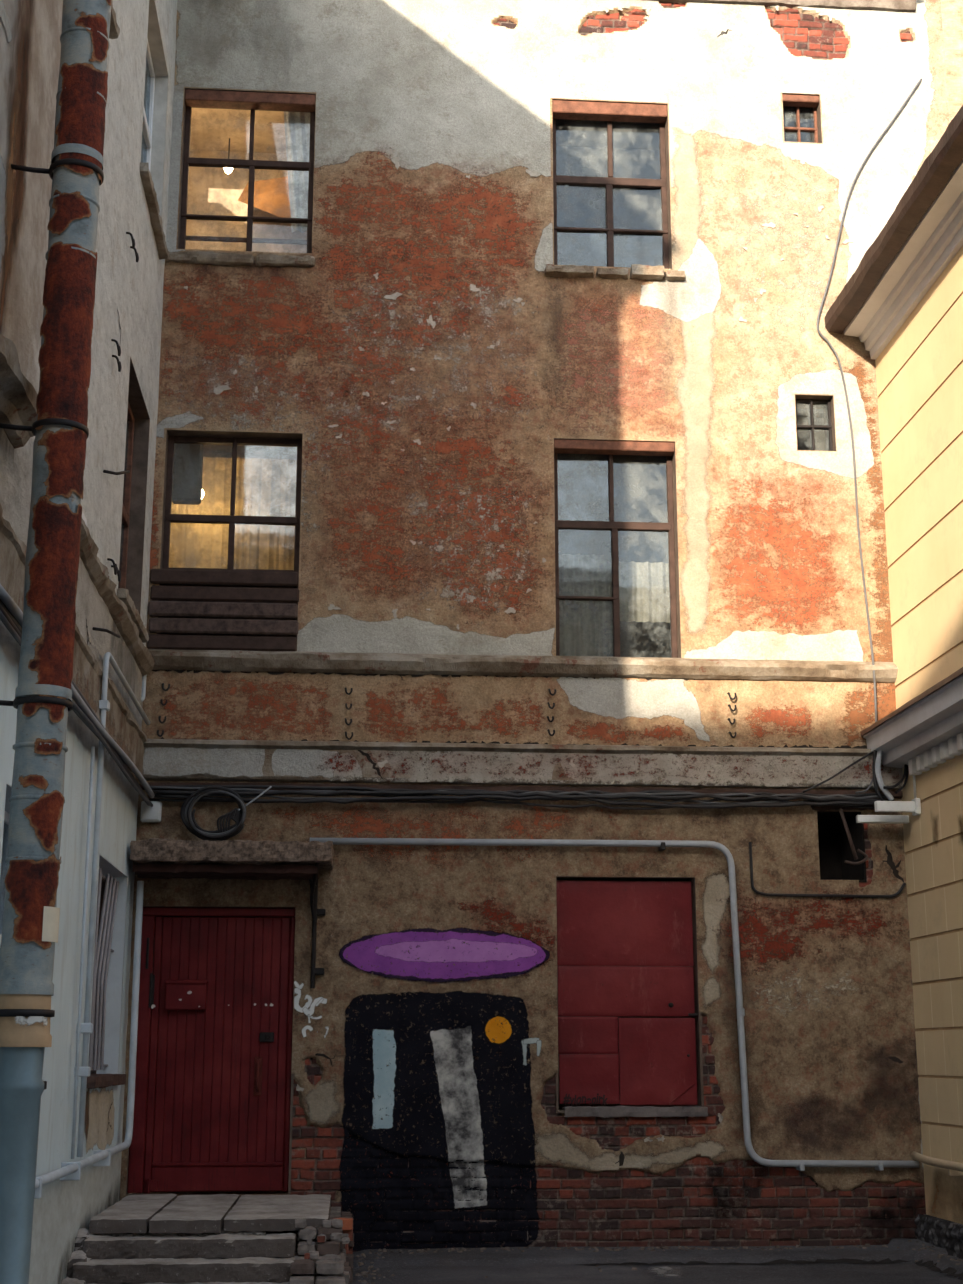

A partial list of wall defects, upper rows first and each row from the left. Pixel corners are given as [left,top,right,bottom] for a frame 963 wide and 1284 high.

corrosion [0,0,31,333]
corrosion [22,0,112,755]
flaking render [166,0,936,662]
peeling [159,672,337,741]
peeling [318,682,903,788]
corrosion [4,774,64,949]
peeling [257,800,618,870]
flaking render [289,1058,926,1252]
flaking render [541,1015,726,1151]
flaking render [863,1040,919,1133]